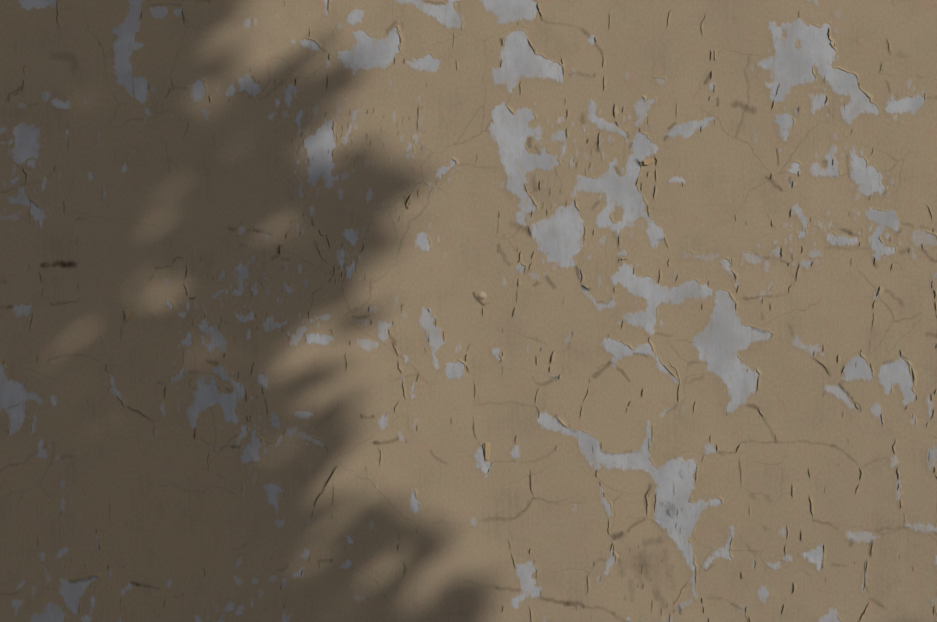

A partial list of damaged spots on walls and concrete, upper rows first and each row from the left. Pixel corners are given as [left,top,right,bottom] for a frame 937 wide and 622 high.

peeling [110,0,187,126]
peeling [272,0,443,203]
peeling [392,0,467,33]
crack [585,13,613,91]
crack [701,12,718,99]
peeling [478,0,937,429]
crack [497,211,549,333]
peeling [345,294,472,383]
crack [535,350,563,411]
peeling [535,409,737,600]
crack [791,469,828,519]
crack [887,437,907,522]